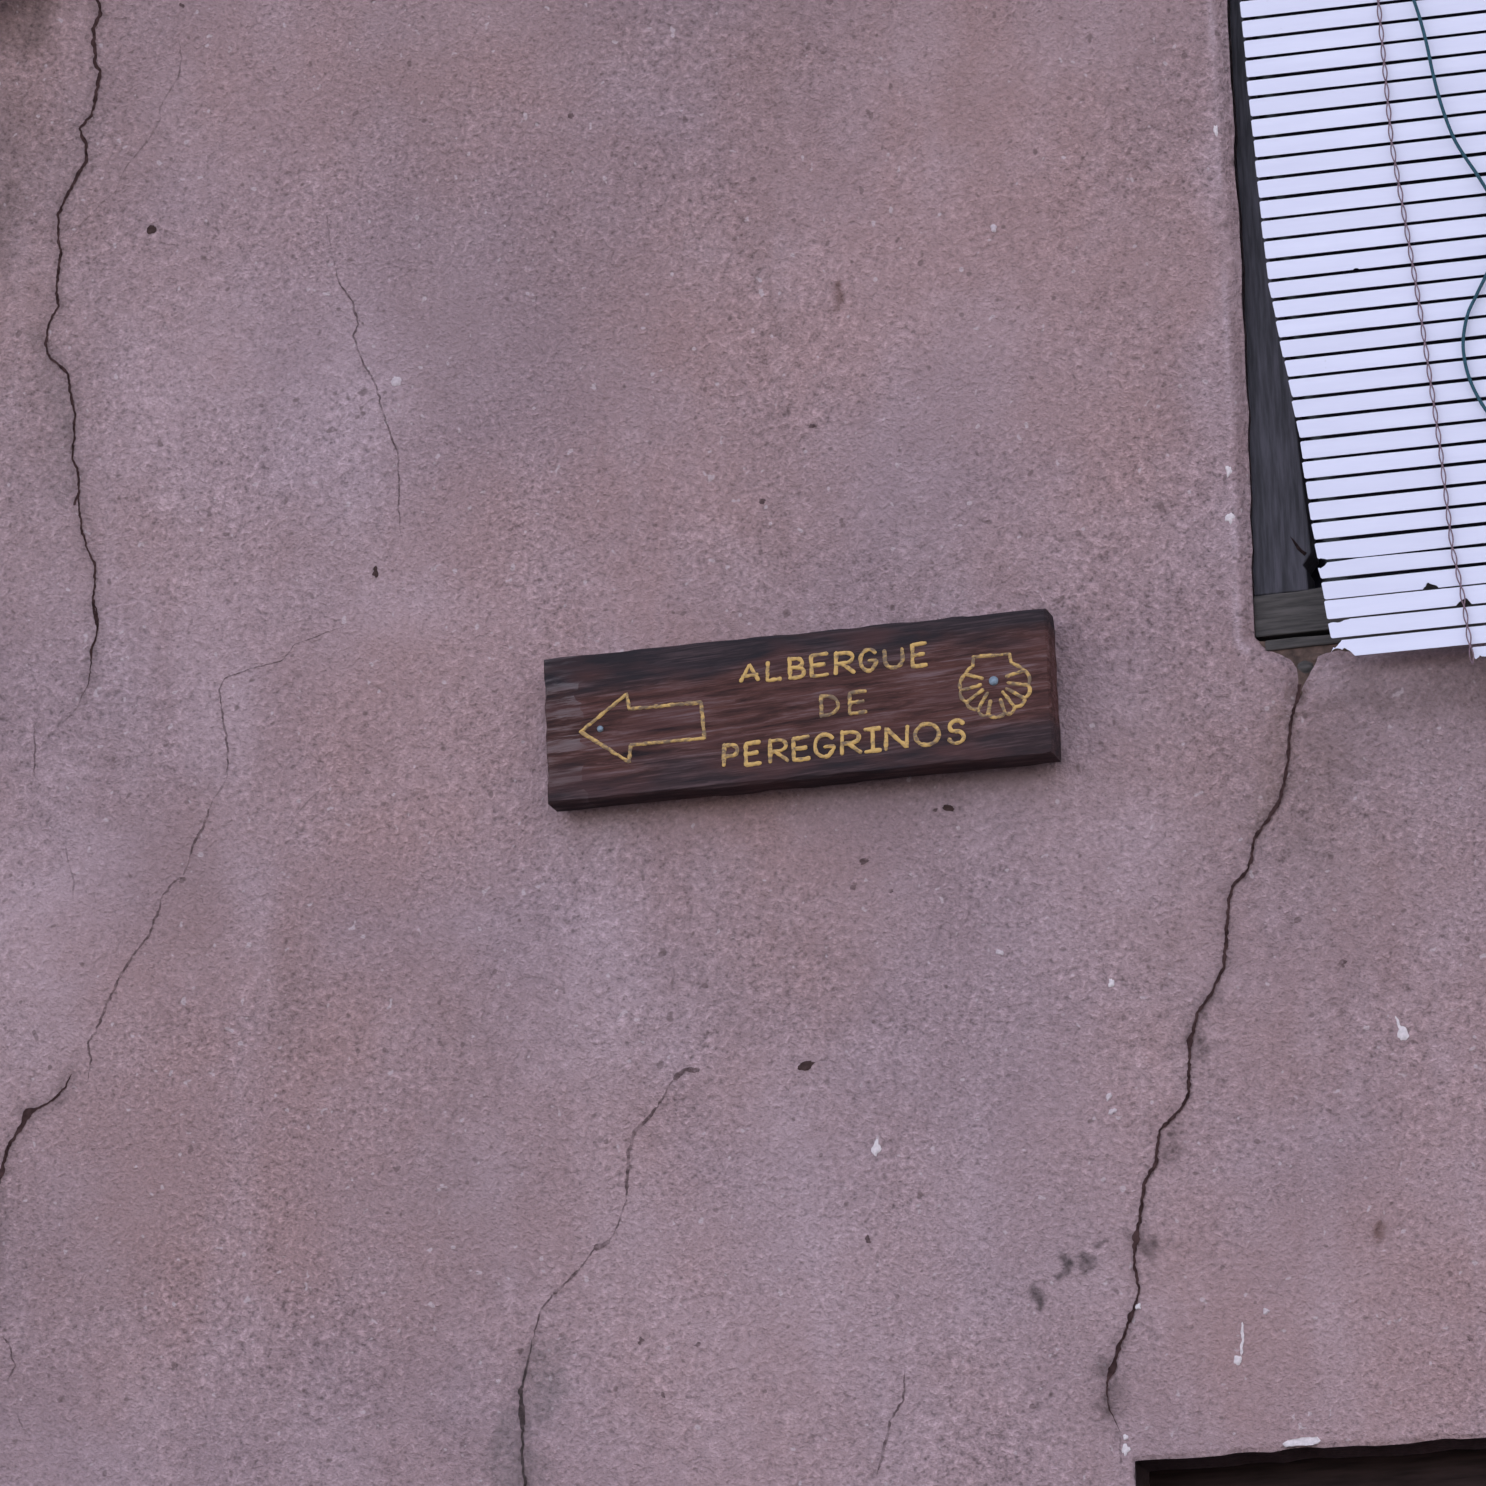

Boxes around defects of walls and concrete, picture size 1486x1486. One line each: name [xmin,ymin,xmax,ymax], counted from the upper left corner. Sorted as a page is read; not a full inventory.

crack [44,0,103,707]
crack [218,633,325,770]
crack [0,810,209,1180]
crack [643,1067,700,1123]
crack [1106,684,1302,1431]
crack [518,1154,630,1486]